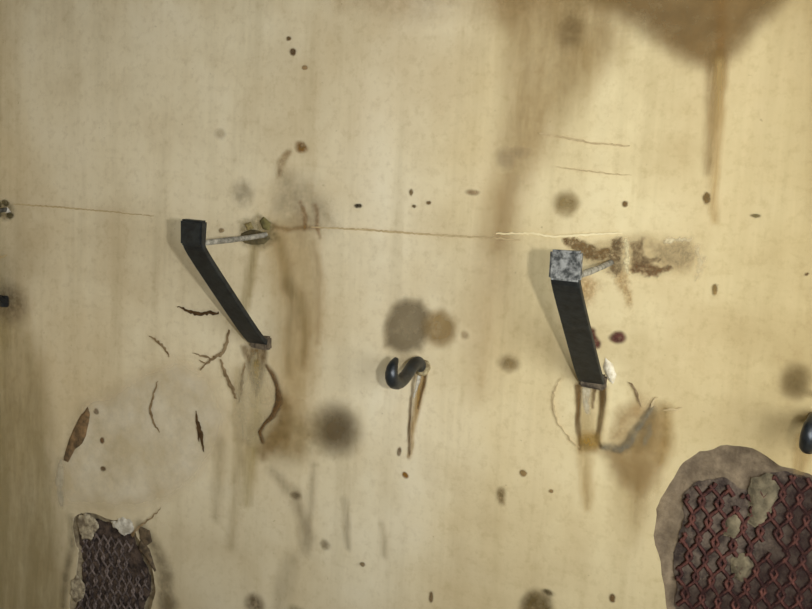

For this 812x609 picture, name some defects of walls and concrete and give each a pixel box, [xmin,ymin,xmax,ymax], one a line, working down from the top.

leakage [600,0,777,103]
crack [149,336,169,358]
crack [177,306,245,404]
corrosion [243,348,266,389]
corrosion [611,332,625,343]
peeling [56,368,218,504]
crack [149,381,160,433]
crack [196,411,204,452]
corrosion [408,375,427,440]
corrosion [575,385,606,449]
spalling [654,445,812,609]
spalling [63,512,170,609]